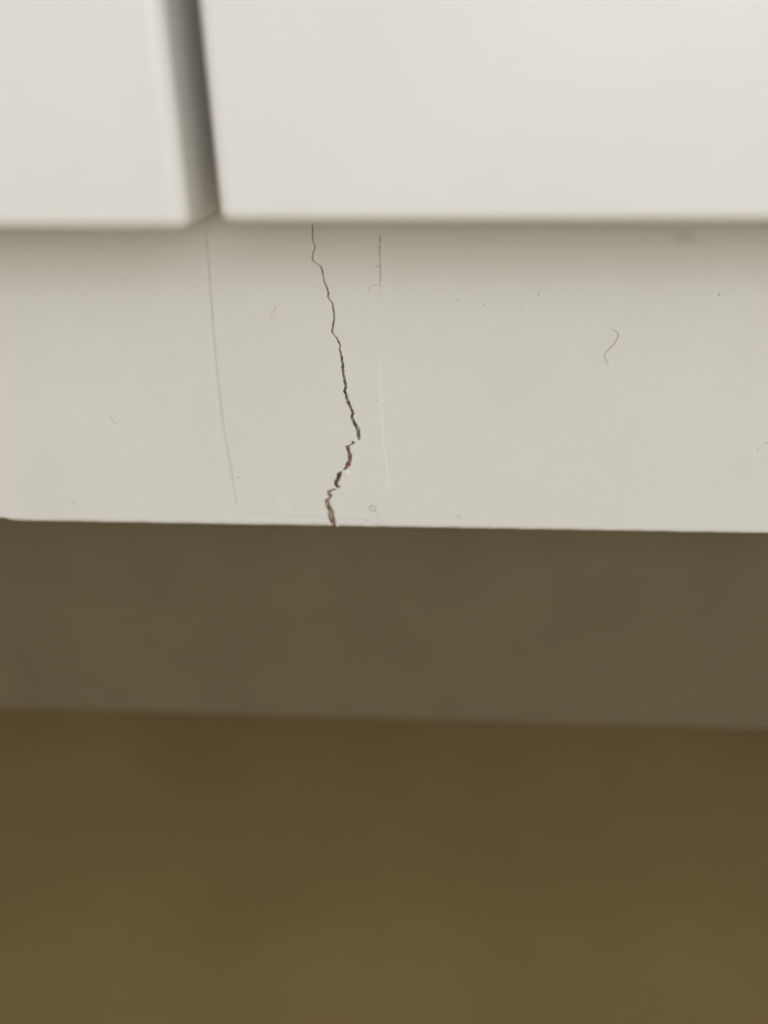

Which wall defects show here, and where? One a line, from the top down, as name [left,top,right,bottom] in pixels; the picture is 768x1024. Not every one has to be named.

crack [312,224,360,527]